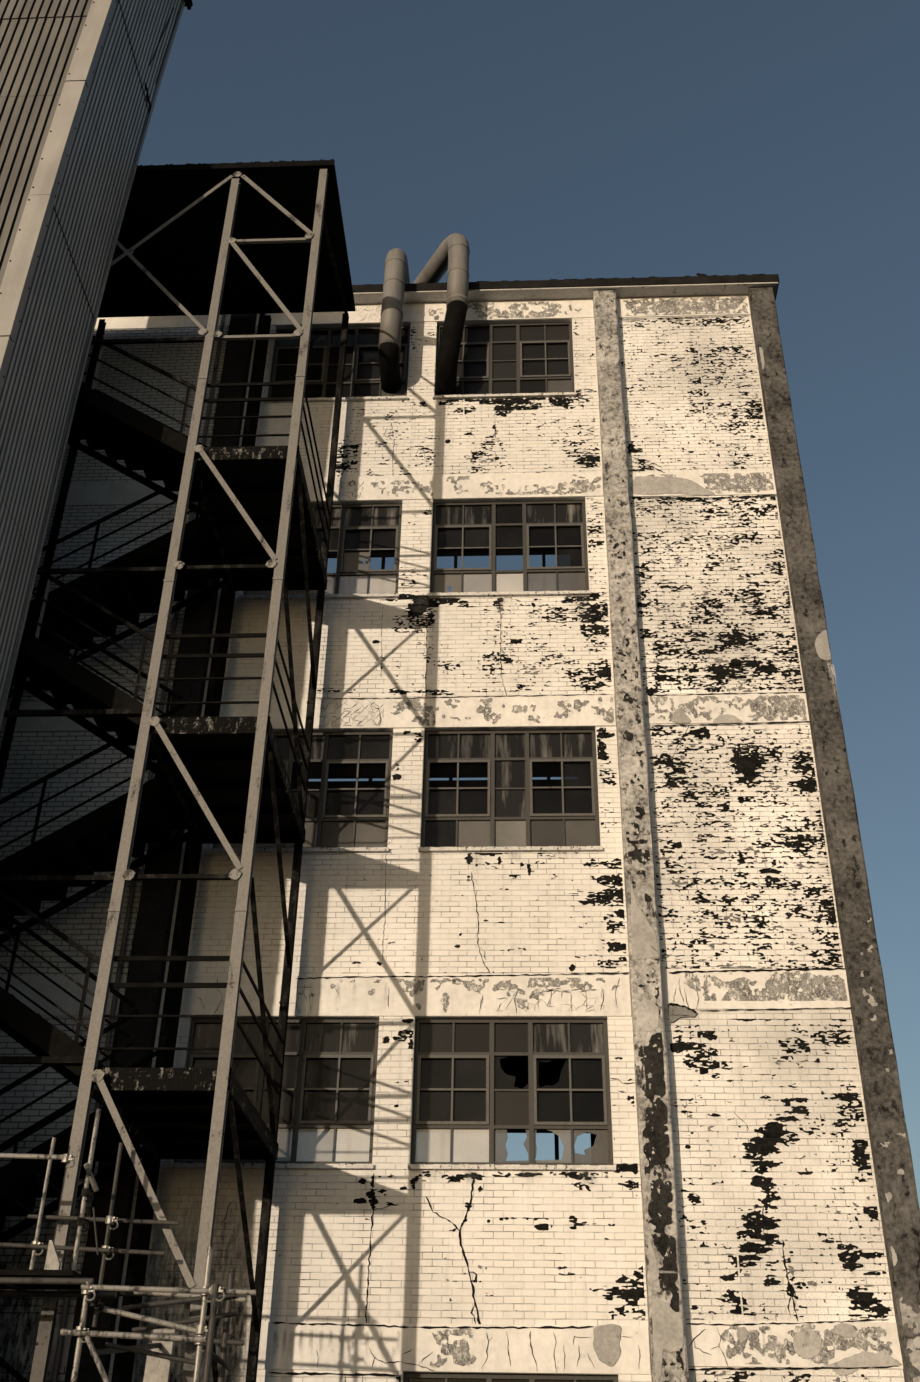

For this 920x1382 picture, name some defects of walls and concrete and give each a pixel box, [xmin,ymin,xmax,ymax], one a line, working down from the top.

crack [296,853,851,1014]
peeling [330,296,920,1382]
crack [269,1172,640,1382]